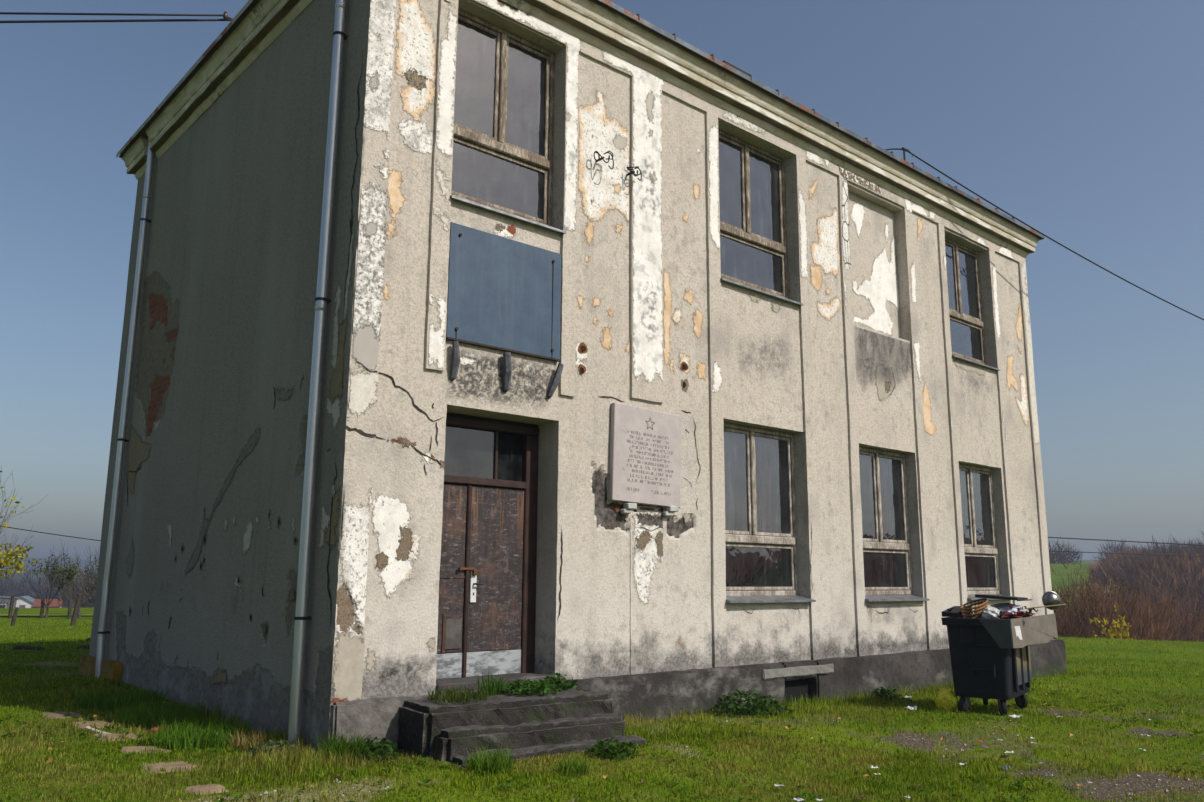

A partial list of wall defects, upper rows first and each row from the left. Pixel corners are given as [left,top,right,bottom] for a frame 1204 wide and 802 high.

peeling [331,0,458,372]
peeling [475,0,723,393]
peeling [798,151,917,335]
peeling [326,370,379,428]
peeling [460,351,483,367]
damp [453,355,550,400]
damp [860,329,909,377]
flaking render [285,571,298,636]
peeling [319,480,422,638]
crack [327,356,443,630]
peeling [592,468,694,604]
flaking render [116,607,349,751]